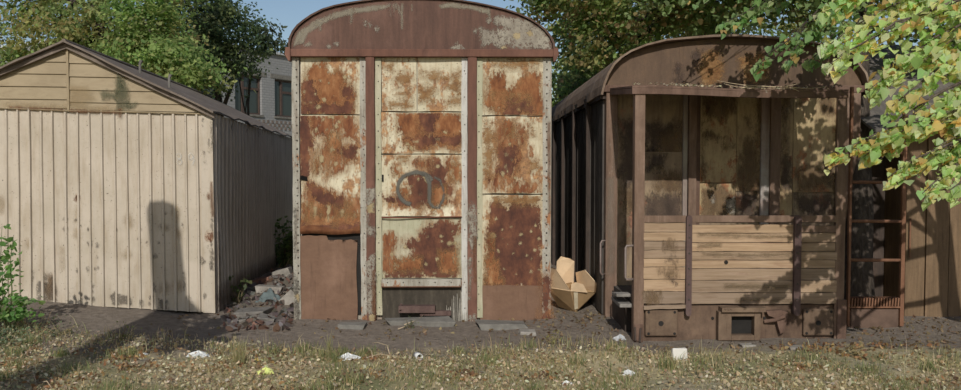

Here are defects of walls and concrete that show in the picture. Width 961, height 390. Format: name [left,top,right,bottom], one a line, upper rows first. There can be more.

peeling [473,15,551,49]
corrosion [300,61,361,234]
corrosion [382,62,462,278]
corrosion [482,58,552,319]
damp [701,96,761,215]
damp [781,98,835,191]